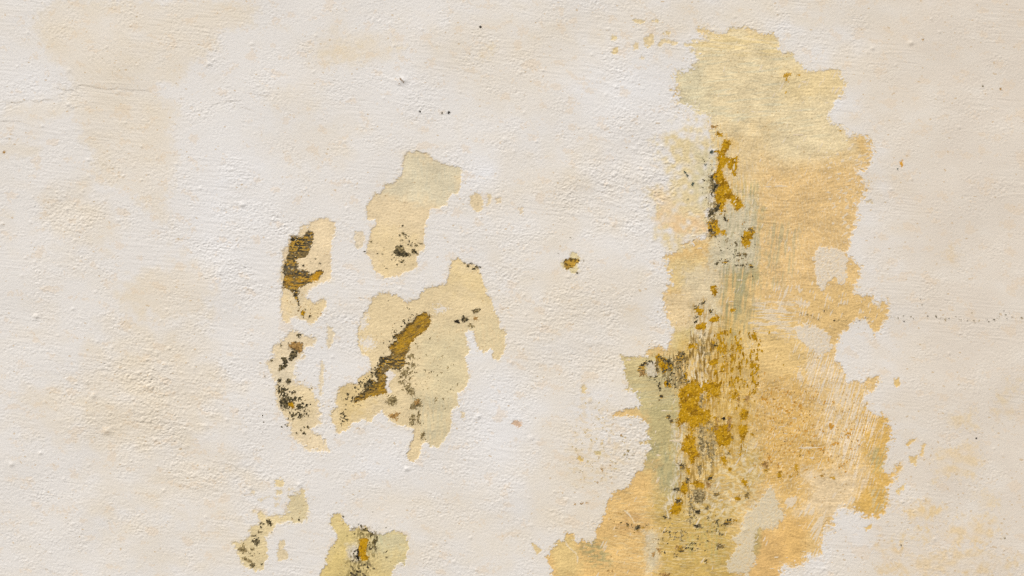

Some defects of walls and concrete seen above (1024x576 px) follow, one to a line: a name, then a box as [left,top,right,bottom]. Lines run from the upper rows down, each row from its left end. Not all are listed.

peeling [262,149,508,463]
peeling [530,18,927,576]
peeling [231,476,311,573]
peeling [318,511,410,576]